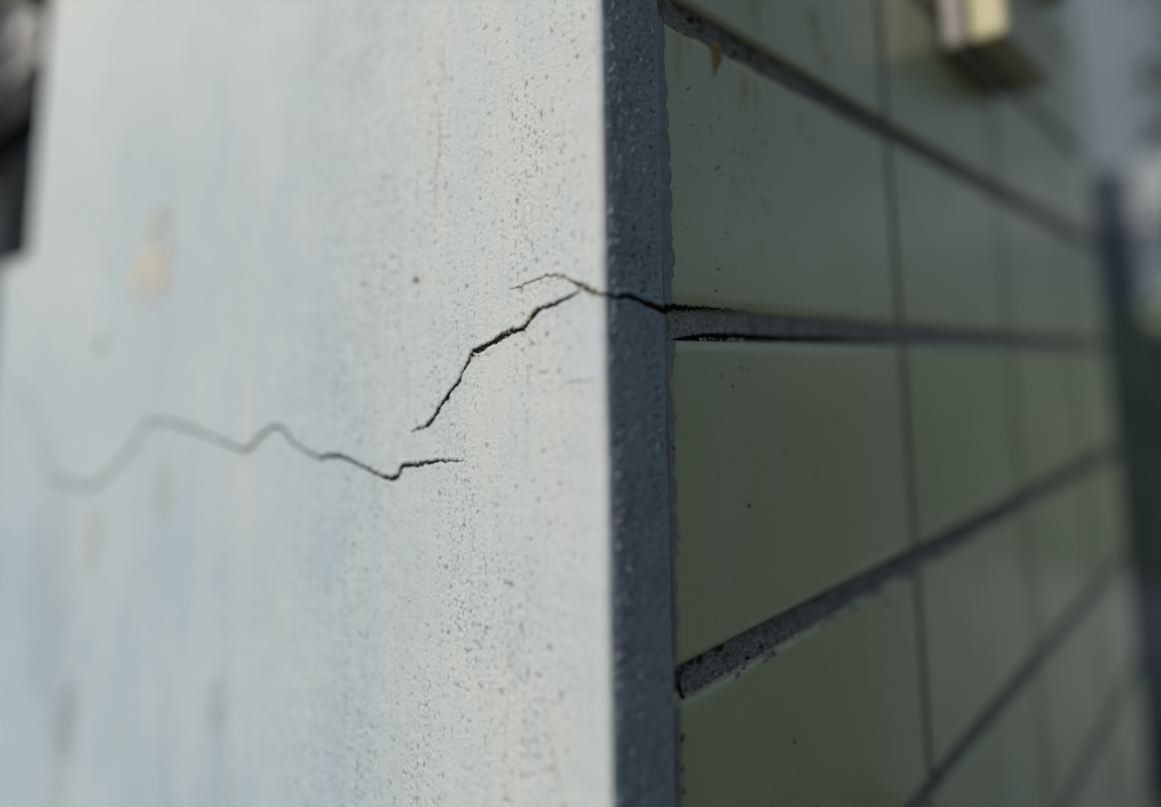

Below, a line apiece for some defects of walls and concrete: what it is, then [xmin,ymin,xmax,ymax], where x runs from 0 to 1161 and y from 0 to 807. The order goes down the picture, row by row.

crack [410,274,900,432]
crack [14,385,464,492]